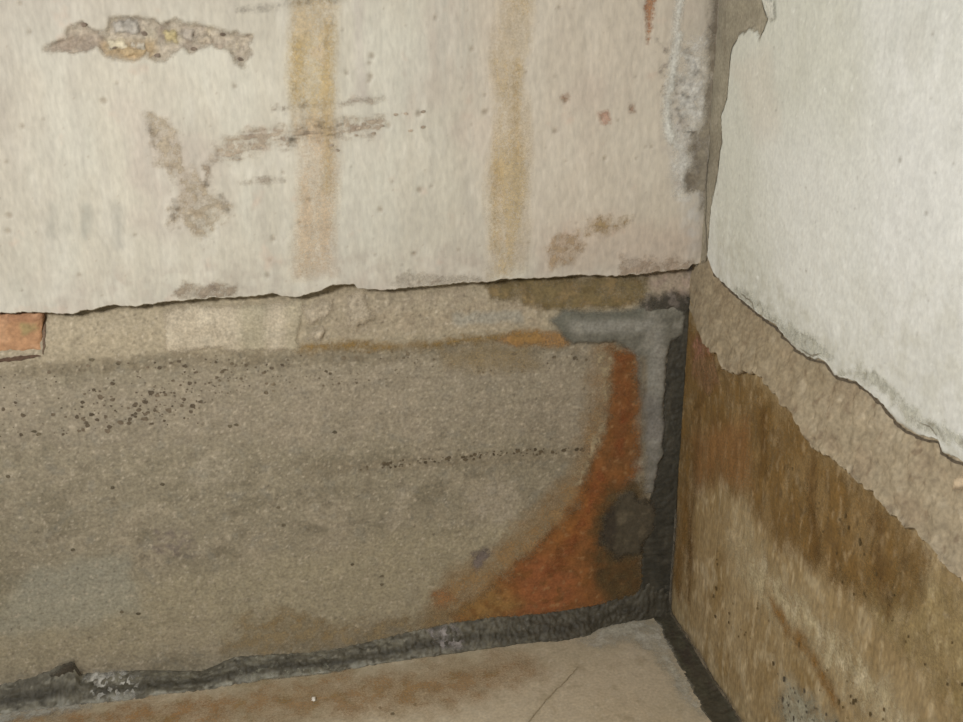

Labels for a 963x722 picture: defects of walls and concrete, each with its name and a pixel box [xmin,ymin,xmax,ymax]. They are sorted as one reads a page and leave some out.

spalling [45,17,253,66]
peeling [684,0,775,267]
corrosion [502,330,568,347]
spalling [840,371,963,447]
corrosion [428,348,642,626]
damp [674,322,963,722]
corrosion [66,660,534,722]